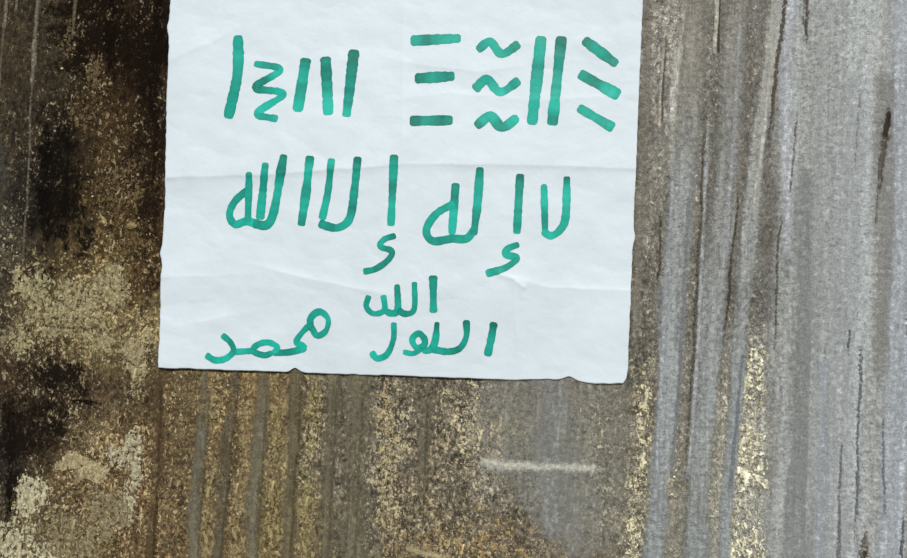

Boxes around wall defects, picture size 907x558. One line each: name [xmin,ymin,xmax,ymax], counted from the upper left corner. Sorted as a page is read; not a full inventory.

leakage [0,392,68,531]
leakage [35,362,90,397]
leakage [23,0,169,301]
leakage [632,0,652,351]
leakage [643,0,907,558]
crack [836,329,863,558]
crack [882,419,905,558]